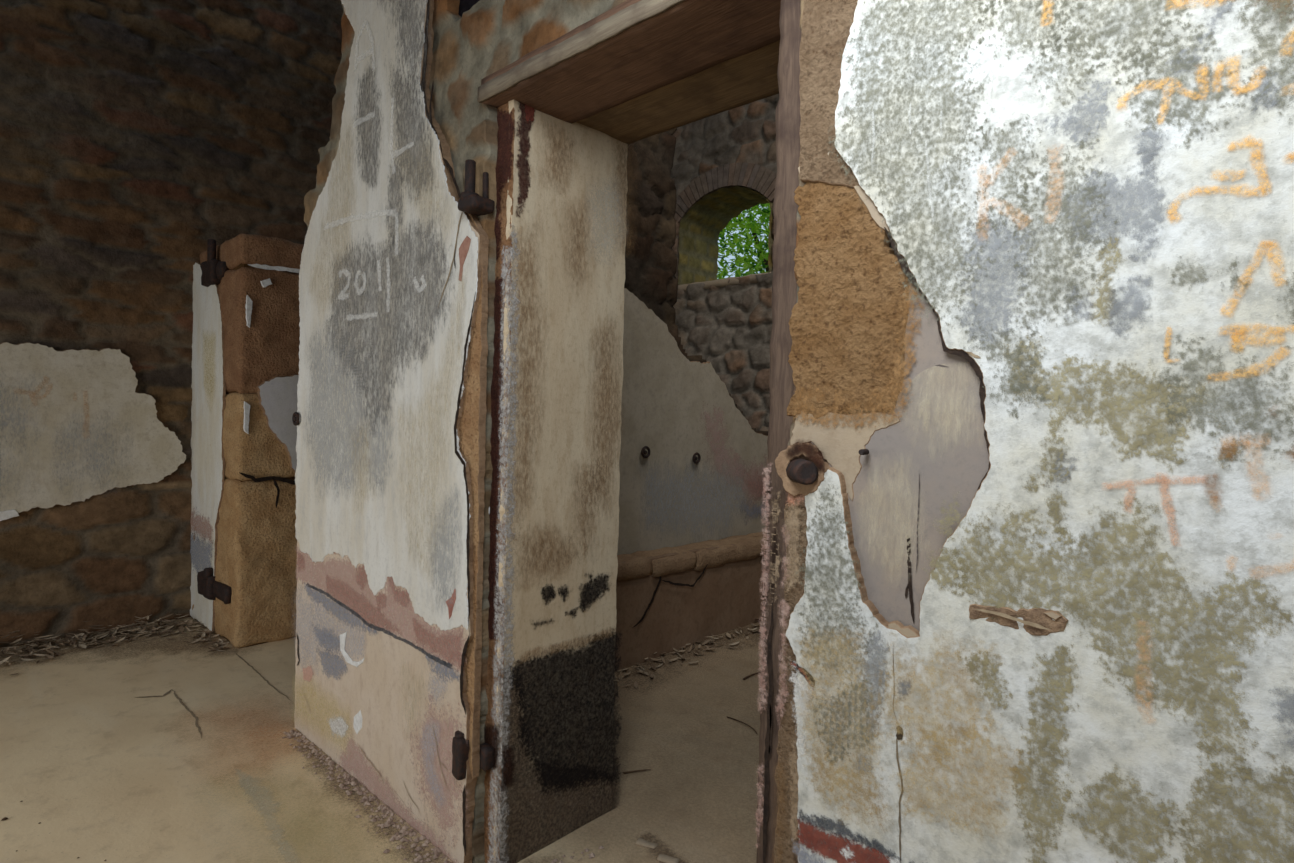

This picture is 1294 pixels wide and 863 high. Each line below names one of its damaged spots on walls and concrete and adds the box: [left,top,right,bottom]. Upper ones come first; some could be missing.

spalling [245,295,253,328]
spalling [243,374,299,473]
spalling [787,166,989,637]
peeling [0,510,19,521]
peeling [190,512,213,572]
crack [239,472,296,508]
crack [905,473,920,623]
crack [633,560,708,628]
spalling [969,604,1068,636]
crack [893,657,903,862]